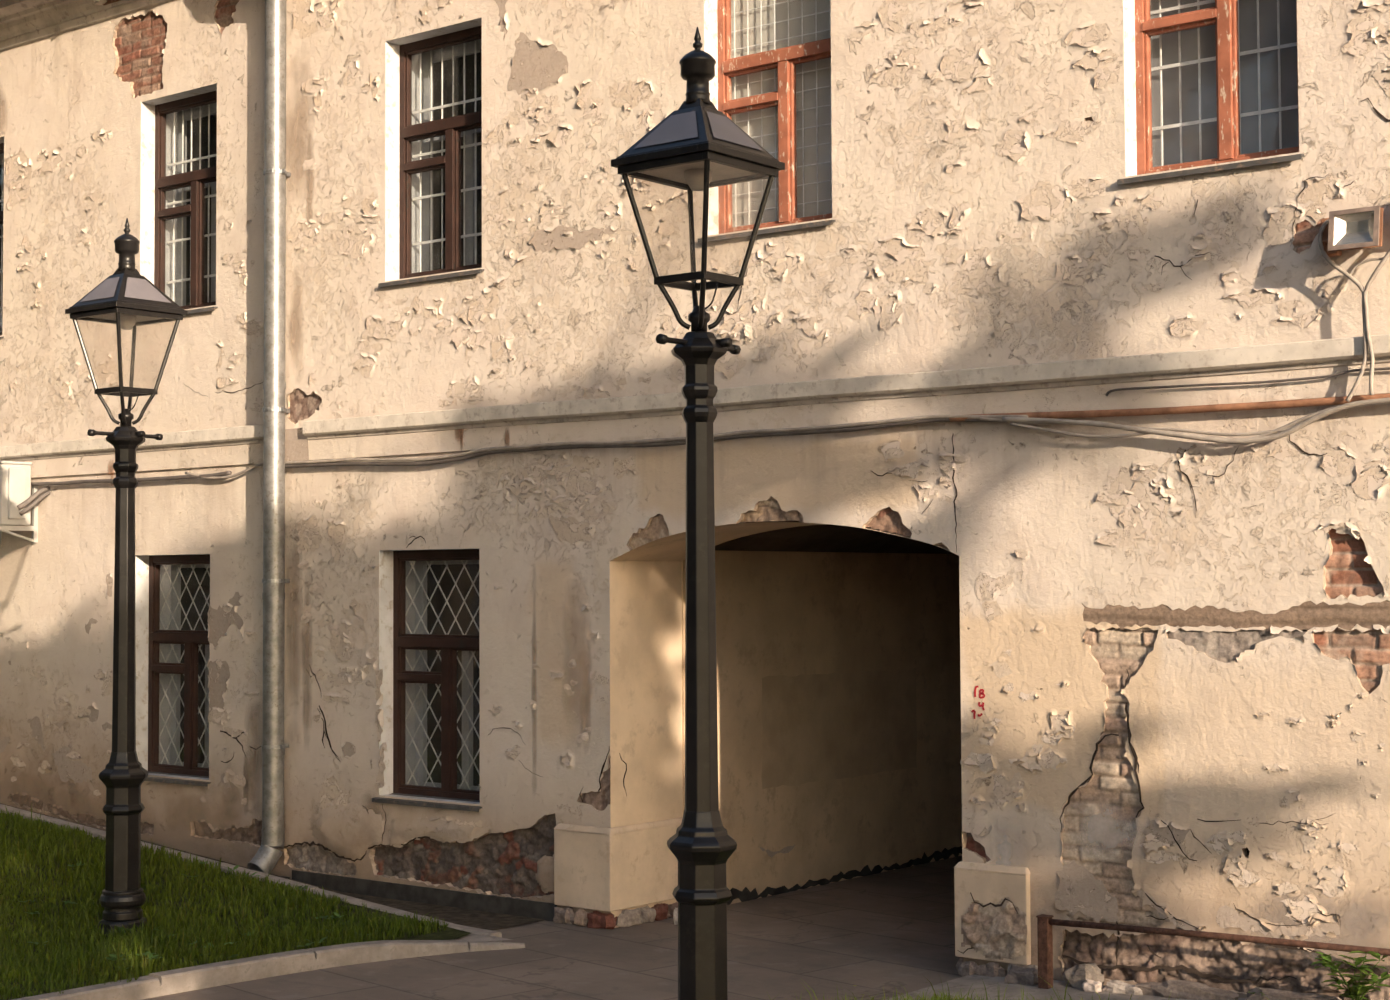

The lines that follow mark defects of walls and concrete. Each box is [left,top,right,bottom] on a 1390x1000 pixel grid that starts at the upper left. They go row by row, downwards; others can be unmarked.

spalling [112,10,167,99]
spalling [215,0,239,39]
peeling [351,0,701,408]
peeling [1179,173,1348,332]
peeling [659,239,830,384]
spalling [286,371,346,424]
spalling [866,508,912,536]
crack [871,433,957,552]
flaking render [1318,518,1388,602]
crack [306,667,340,761]
spalling [374,814,556,898]
flaking render [1052,624,1390,1000]